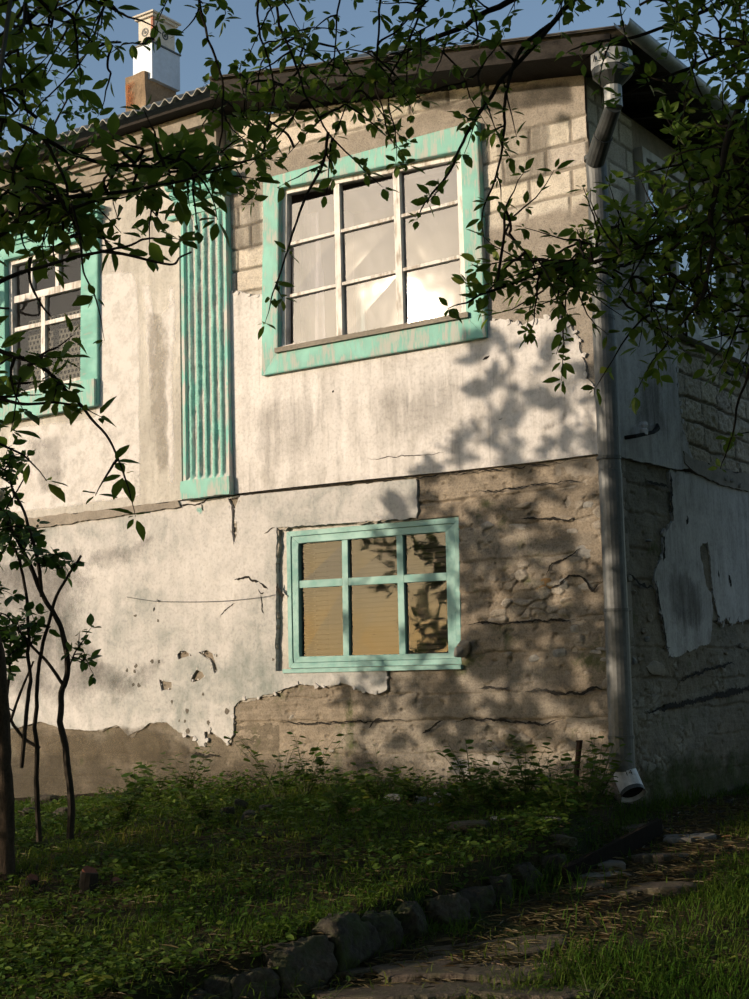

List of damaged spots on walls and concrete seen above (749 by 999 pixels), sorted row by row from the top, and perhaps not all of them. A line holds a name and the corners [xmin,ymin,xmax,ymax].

crack [181,452,588,510]
crack [630,473,689,650]
crack [220,576,284,617]
flaking render [224,455,749,808]
spalling [175,649,217,682]
crack [645,662,749,714]
flaking render [178,709,211,742]